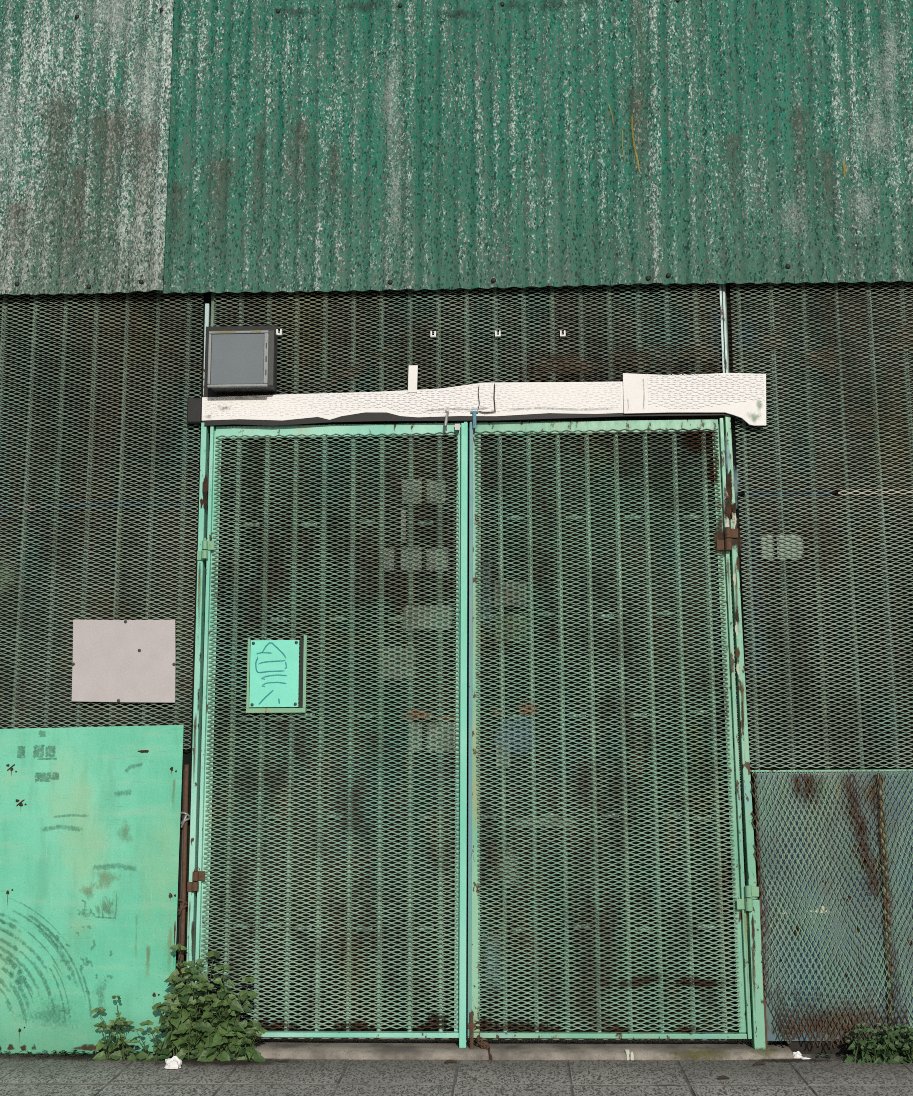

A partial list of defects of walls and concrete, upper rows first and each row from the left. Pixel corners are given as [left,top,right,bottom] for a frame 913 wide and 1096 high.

corrosion [680,428,744,734]
corrosion [745,774,767,994]
corrosion [775,774,908,1048]